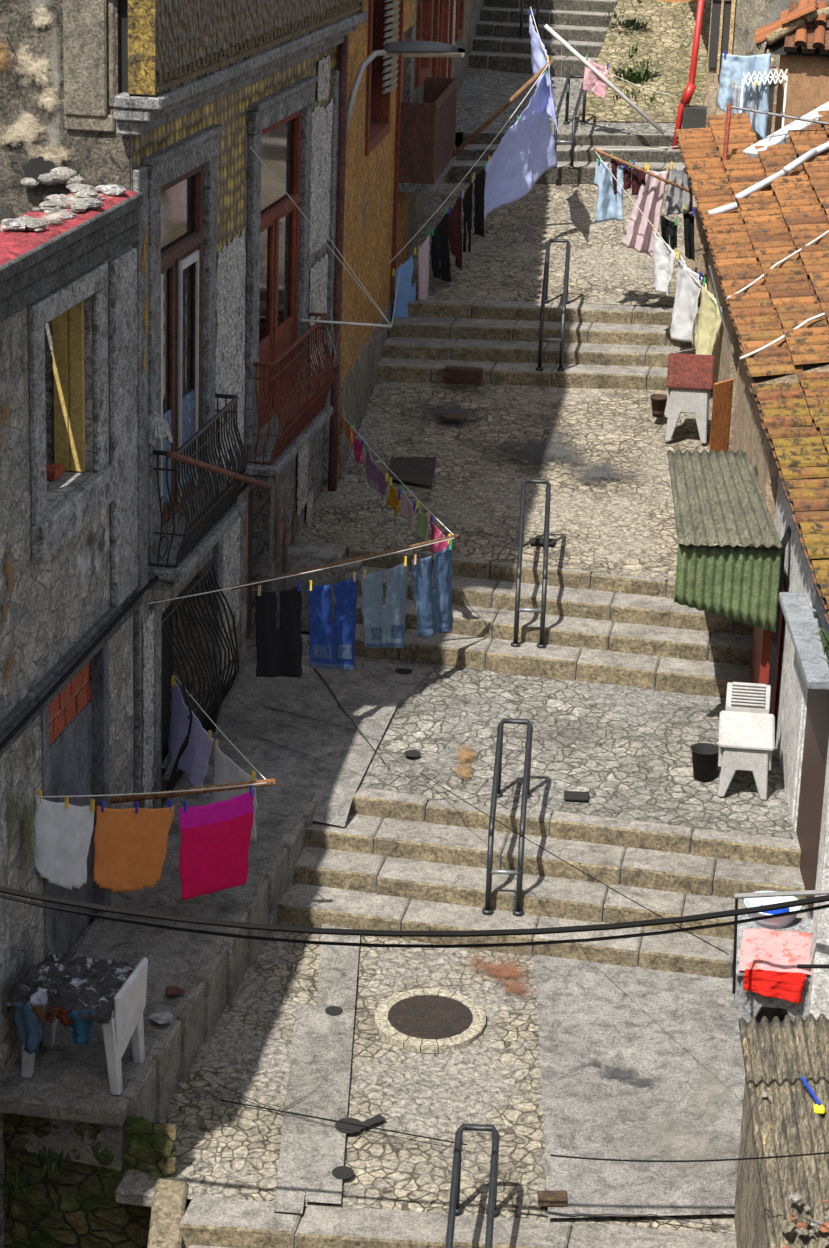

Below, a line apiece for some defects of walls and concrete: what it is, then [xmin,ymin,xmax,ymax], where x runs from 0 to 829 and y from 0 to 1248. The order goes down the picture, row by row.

flaking render [33,4,53,28]
spalling [0,45,86,221]